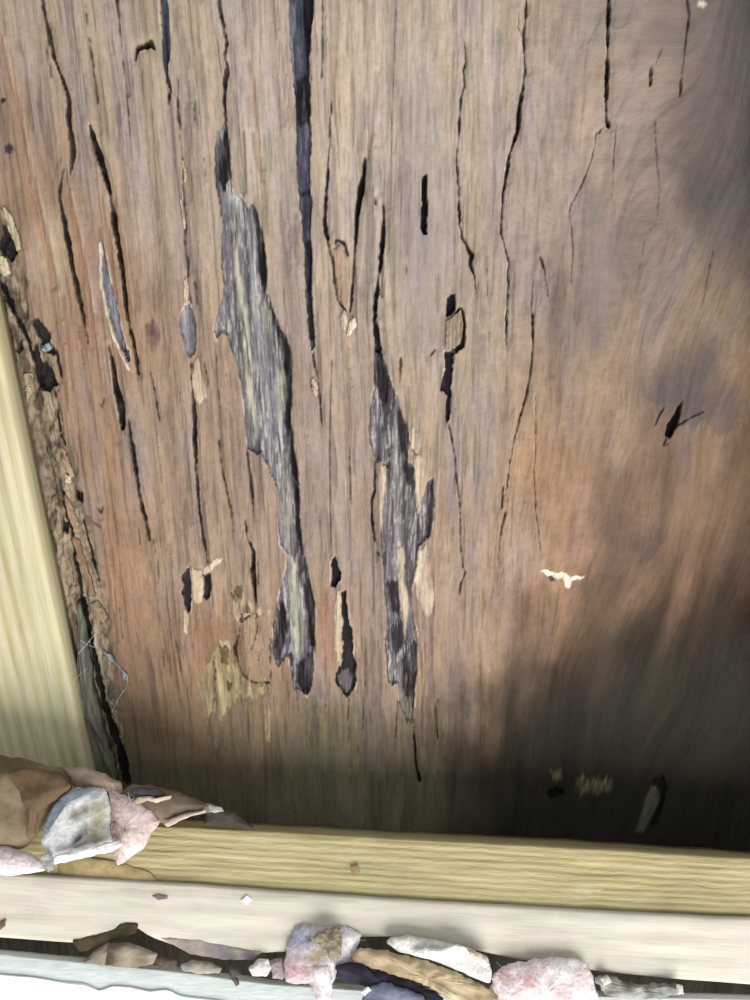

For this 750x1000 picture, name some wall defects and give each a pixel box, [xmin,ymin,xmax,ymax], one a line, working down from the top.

peeling [0,255,12,277]
peeling [3,206,21,252]
crack [42,0,160,540]
crack [456,52,476,289]
crack [500,0,535,535]
crack [574,0,615,200]
peeling [23,373,35,402]
peeling [60,444,108,622]
peeling [230,586,271,633]
crack [449,427,466,595]
spalling [540,569,585,588]
crack [655,408,704,447]